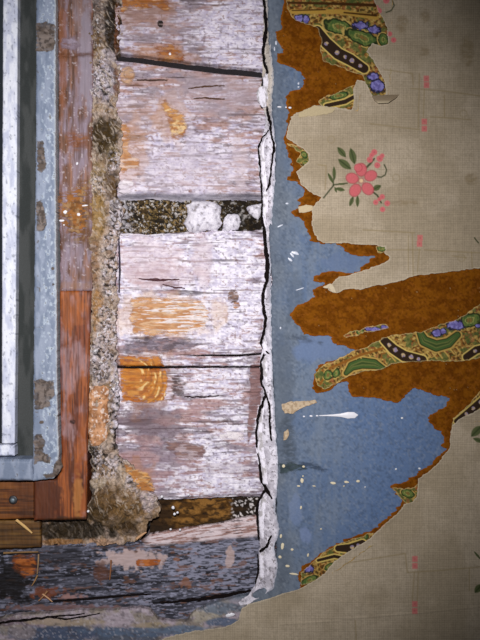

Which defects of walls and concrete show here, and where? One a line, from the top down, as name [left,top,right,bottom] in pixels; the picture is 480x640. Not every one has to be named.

peeling [35,22,56,52]
crack [117,0,269,100]
peeling [299,105,335,118]
crack [0,106,275,624]
peeling [34,379,55,410]